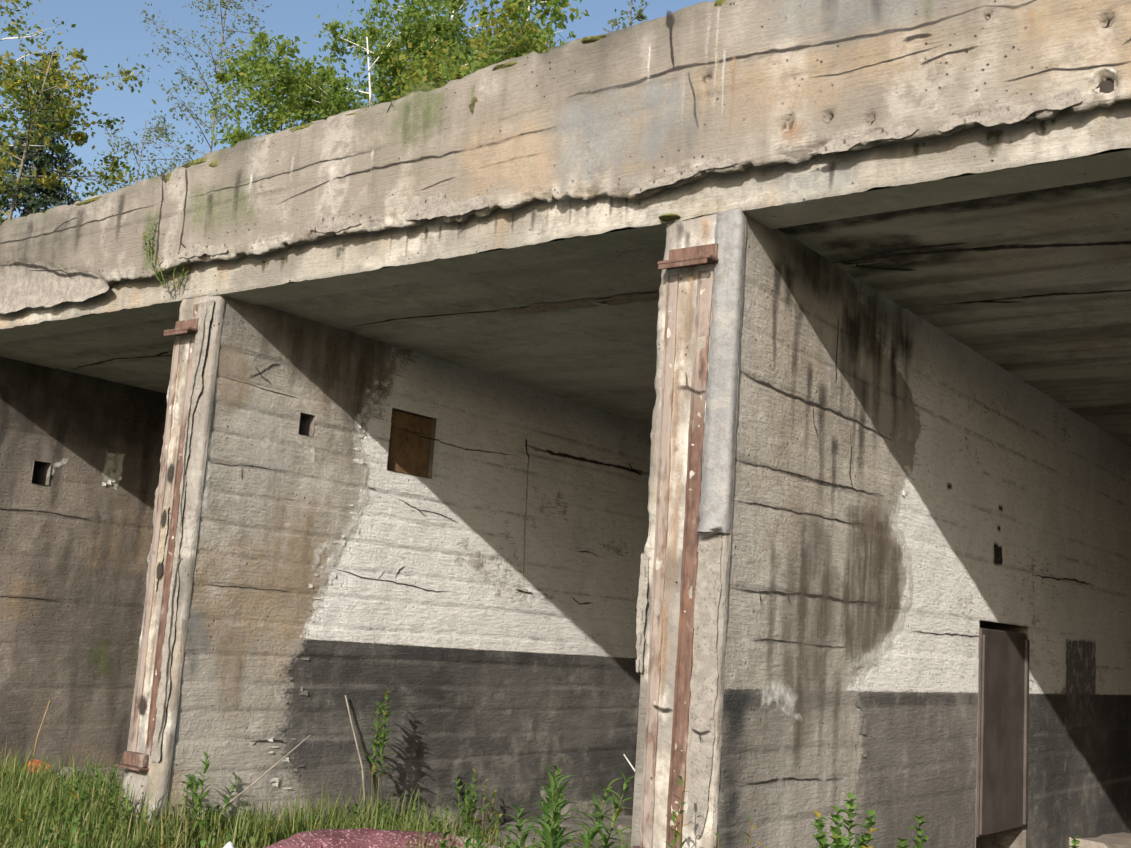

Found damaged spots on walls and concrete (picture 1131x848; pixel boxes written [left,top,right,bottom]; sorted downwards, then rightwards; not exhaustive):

spalling [808,124,920,154]
crack [0,129,545,268]
water stain [779,222,829,235]
water stain [843,176,1131,225]
spalling [0,260,109,314]
peeling [101,452,124,489]
peeling [353,379,390,464]
crack [394,427,646,594]
crack [737,375,884,496]
crack [337,566,444,592]
water stain [844,498,913,679]
water stain [762,643,818,725]